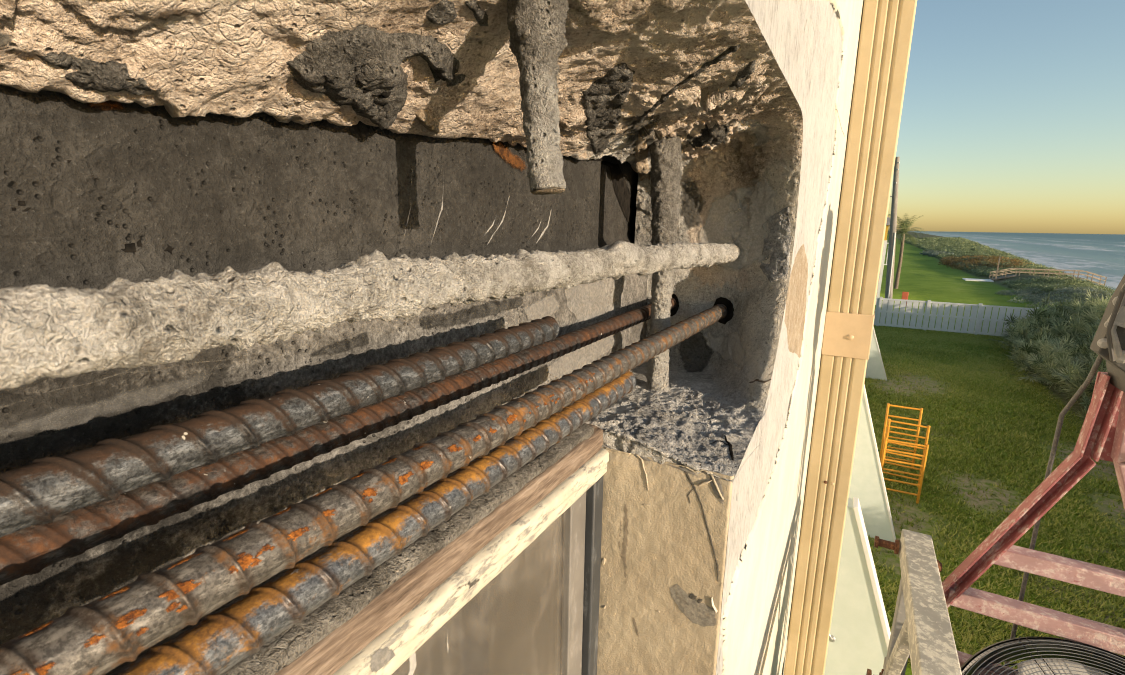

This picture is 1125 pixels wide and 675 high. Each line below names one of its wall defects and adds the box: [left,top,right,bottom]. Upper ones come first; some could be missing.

spalling [0,0,808,675]
corrosion [493,141,526,170]